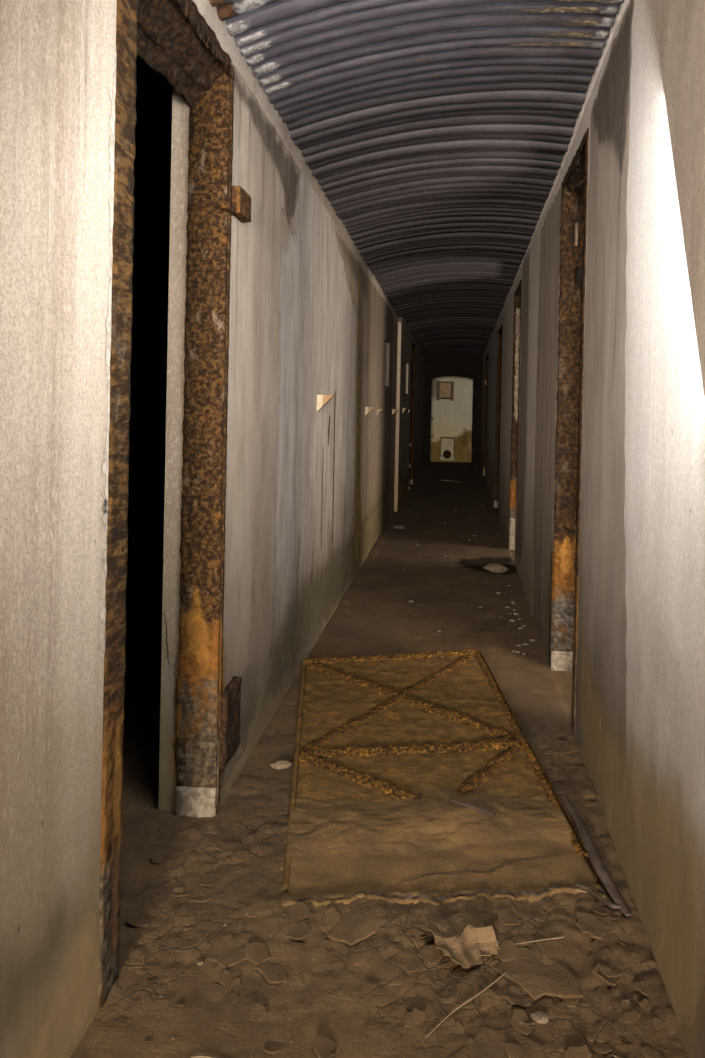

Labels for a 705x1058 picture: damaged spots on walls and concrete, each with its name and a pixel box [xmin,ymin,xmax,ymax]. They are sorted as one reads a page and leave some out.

corrosion [209,0,238,21]
corrosion [558,539,573,573]
corrosion [181,588,225,693]